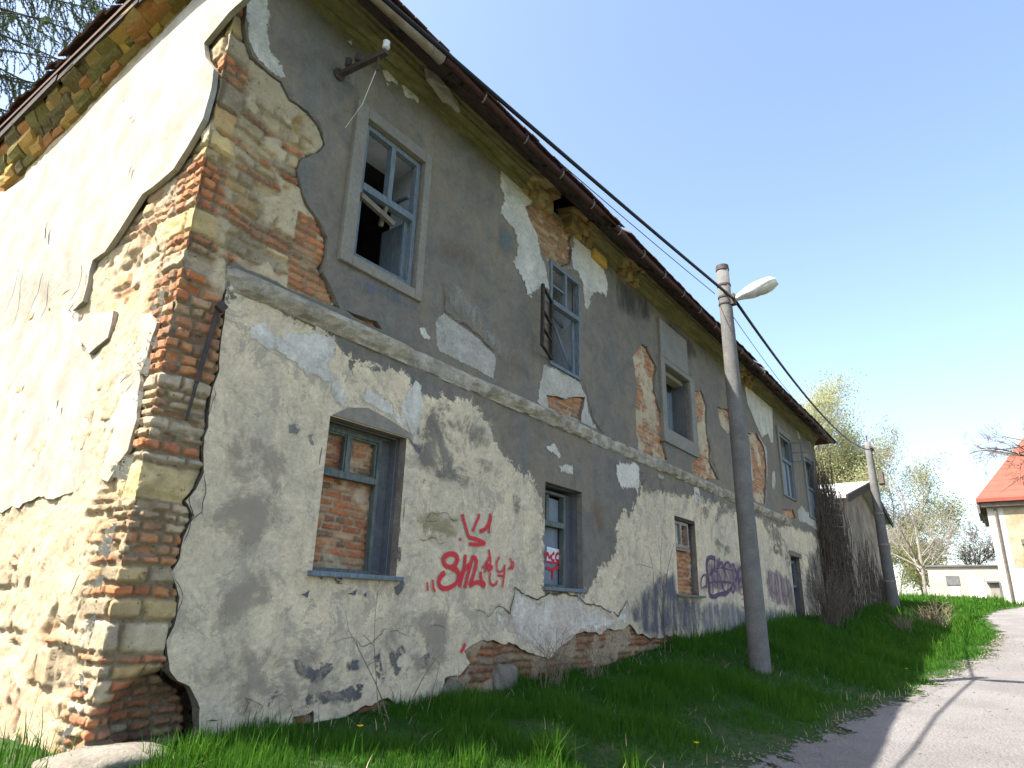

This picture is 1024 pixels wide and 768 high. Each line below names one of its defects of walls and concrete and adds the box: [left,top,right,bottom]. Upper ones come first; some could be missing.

peeling [0,0,745,754]
crack [183,388,216,543]
crack [161,577,183,675]
crack [478,587,631,621]
peeling [755,506,831,618]